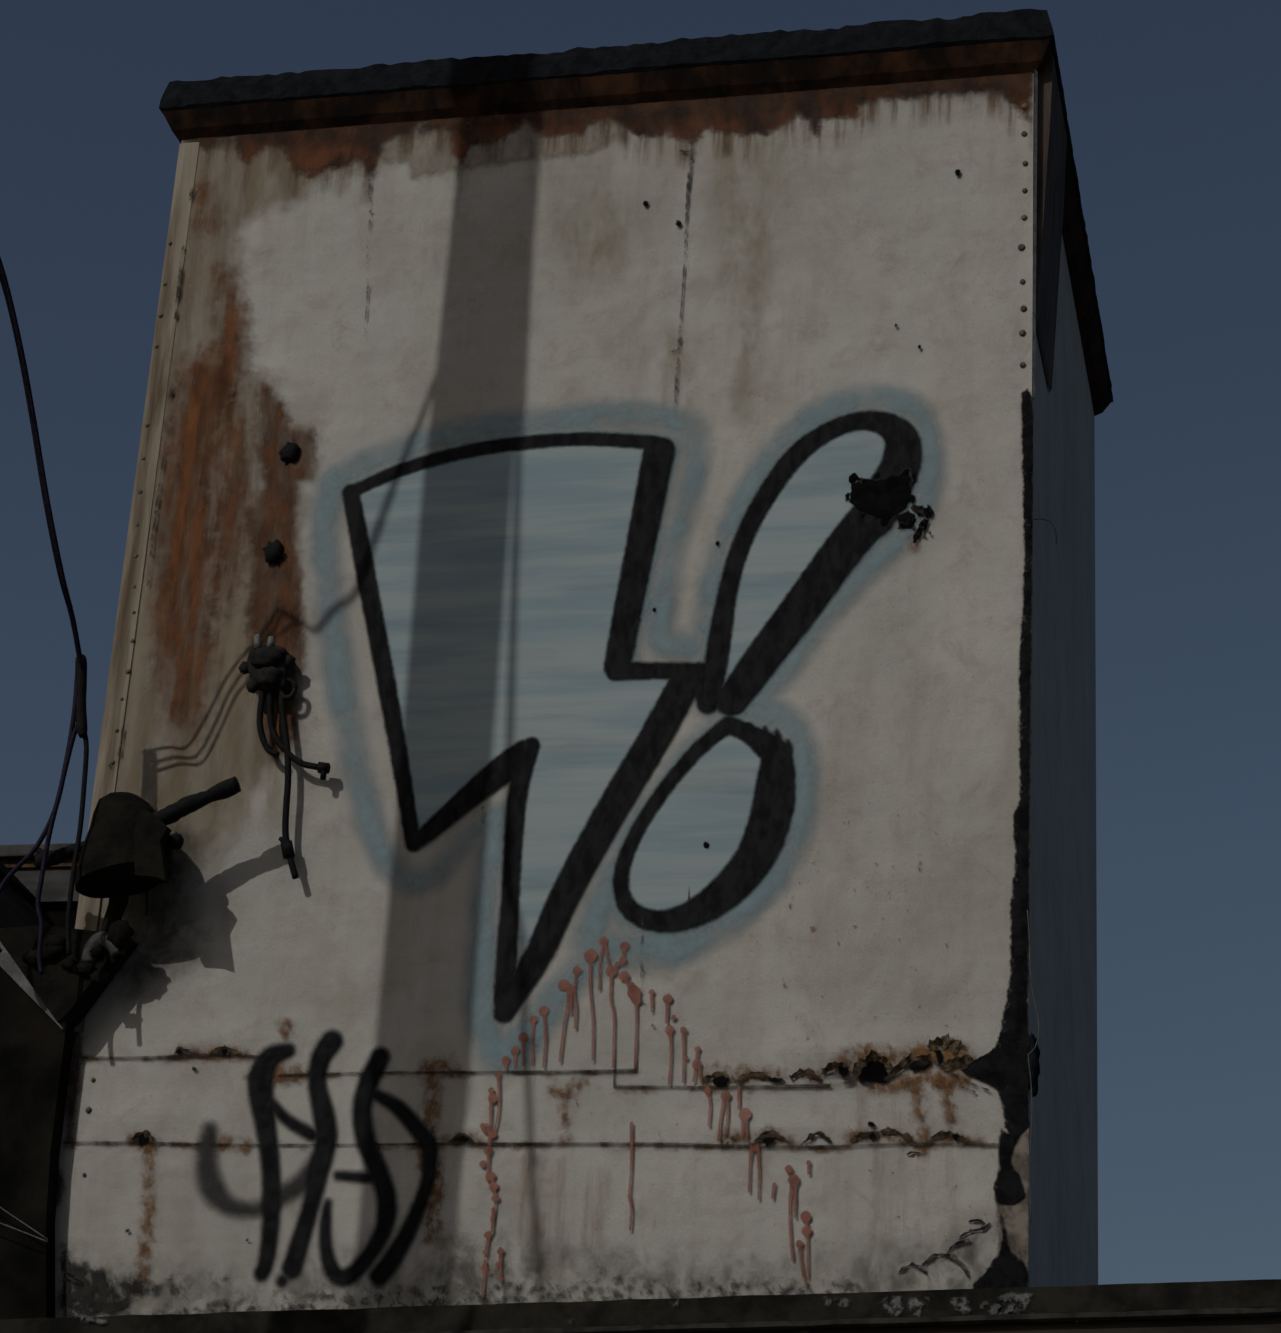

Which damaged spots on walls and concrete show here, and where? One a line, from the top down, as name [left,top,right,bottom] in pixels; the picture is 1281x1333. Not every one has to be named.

rust [188,73,1033,187]
rust [155,273,314,752]
peeling [899,504,934,541]
rust [409,1059,485,1241]
rust [815,1045,981,1154]
rust [127,1135,155,1283]
damp [59,1251,184,1317]